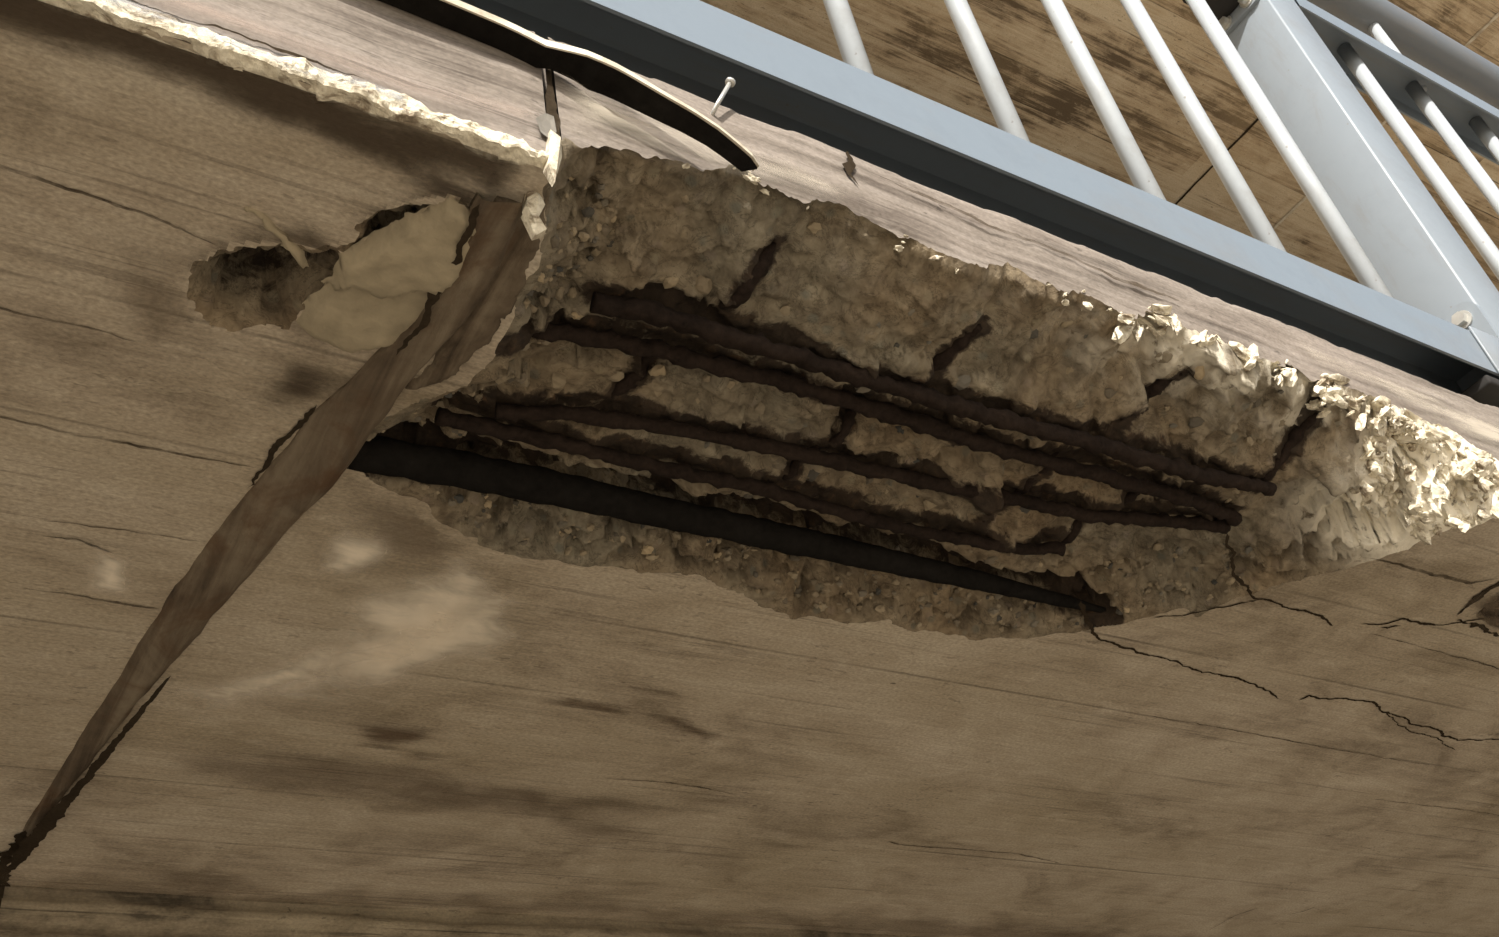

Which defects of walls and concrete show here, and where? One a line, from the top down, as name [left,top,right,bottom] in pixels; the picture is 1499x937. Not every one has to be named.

crack [0,307,41,319]
crack [396,204,480,355]
spalling [39,0,1499,641]
crack [118,405,317,487]
crack [61,593,158,609]
crack [44,520,195,554]
crack [1155,534,1499,670]
crack [1079,602,1499,765]
crack [0,677,170,887]